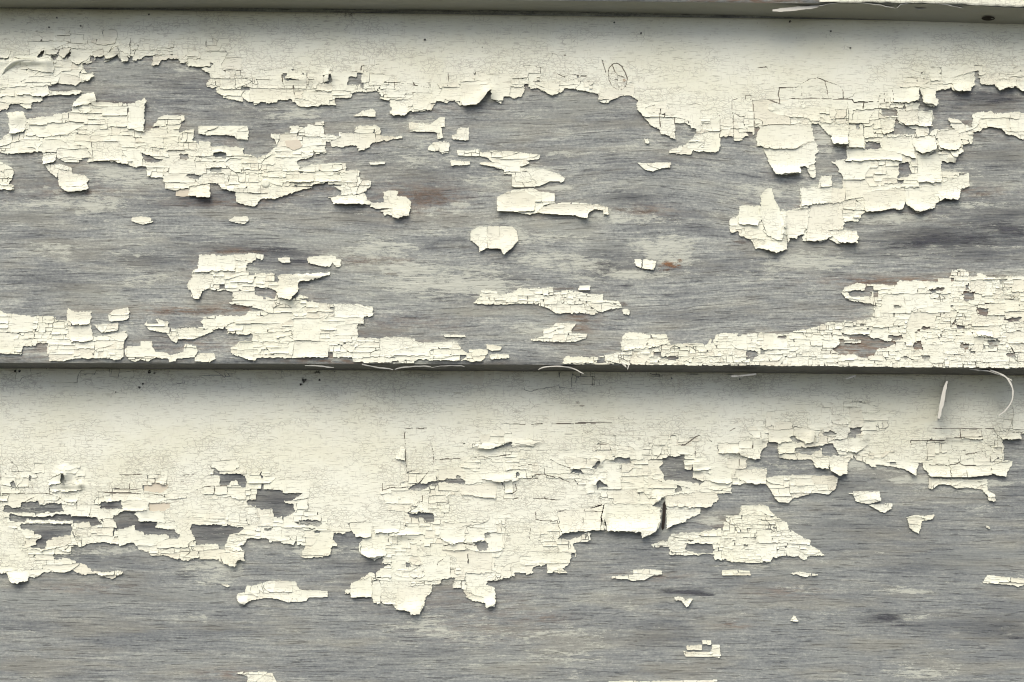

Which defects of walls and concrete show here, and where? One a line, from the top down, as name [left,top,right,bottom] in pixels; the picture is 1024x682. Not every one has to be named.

peeling [0,29,1024,254]
peeling [0,253,1024,392]
peeling [0,401,1024,615]
crack [659,501,667,530]